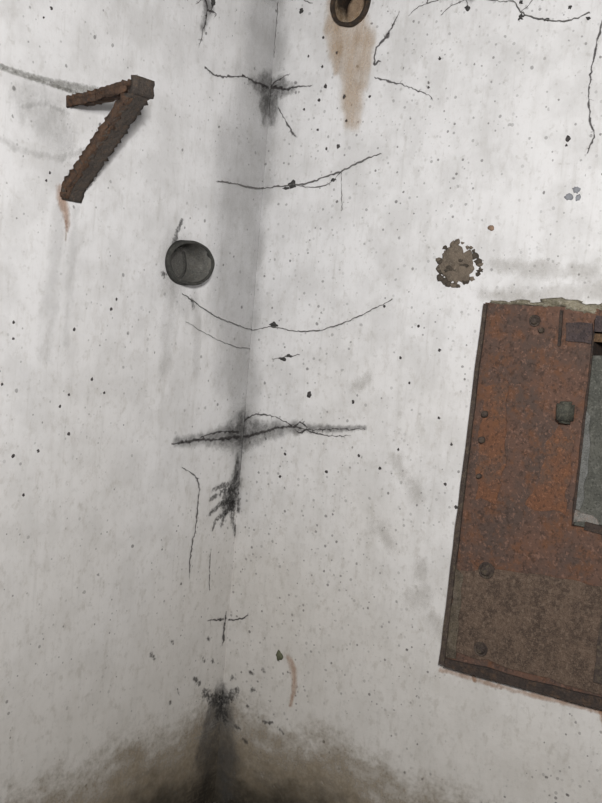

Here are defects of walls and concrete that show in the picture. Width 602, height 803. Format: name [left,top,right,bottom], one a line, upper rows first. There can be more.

crack [198,0,217,45]
crack [205,67,312,136]
crack [373,15,432,99]
crack [587,23,602,153]
rust [60,92,133,199]
spalling [435,239,483,288]
crack [172,413,359,445]
crack [182,467,211,590]
leakage [45,675,437,803]